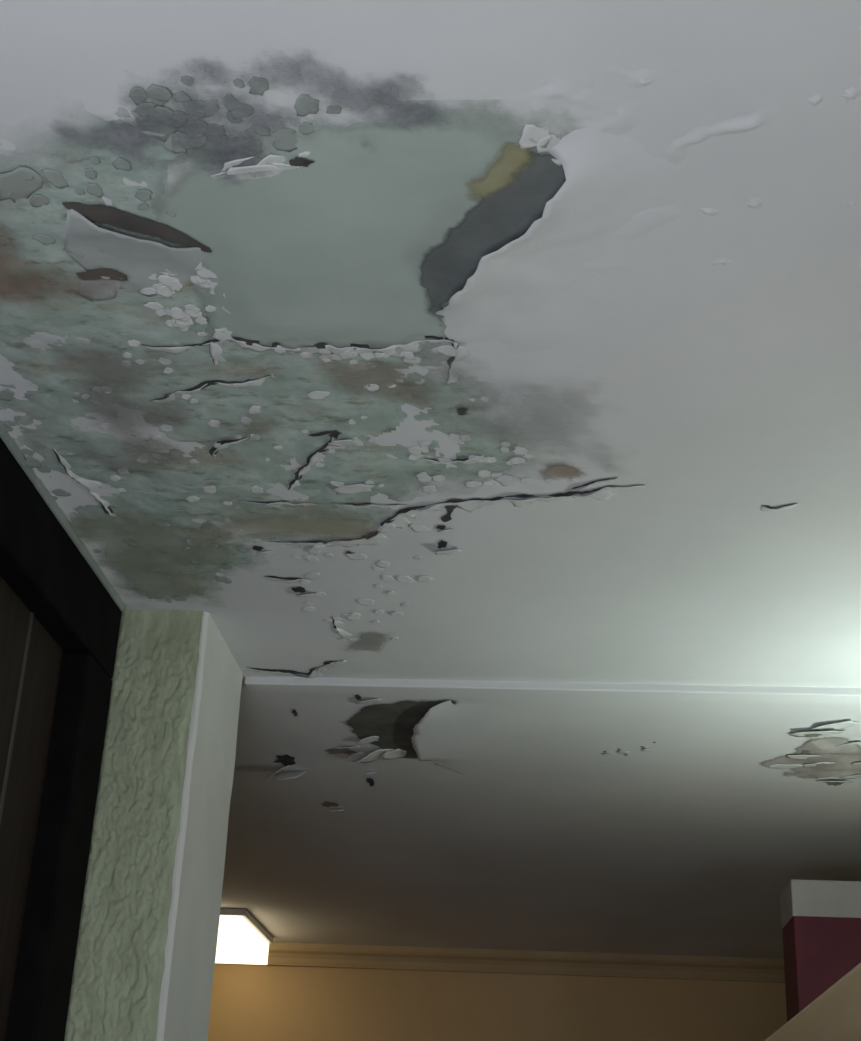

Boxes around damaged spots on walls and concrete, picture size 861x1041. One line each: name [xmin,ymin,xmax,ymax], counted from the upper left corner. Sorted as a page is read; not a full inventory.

damp [273,62,432,125]
peeling [0,76,684,365]
peeling [121,340,174,374]
damp [0,97,521,598]
crack [141,336,470,403]
peeling [364,379,404,392]
crack [237,431,645,547]
crack [264,575,308,583]
peeling [326,694,536,786]
peeling [761,721,861,786]